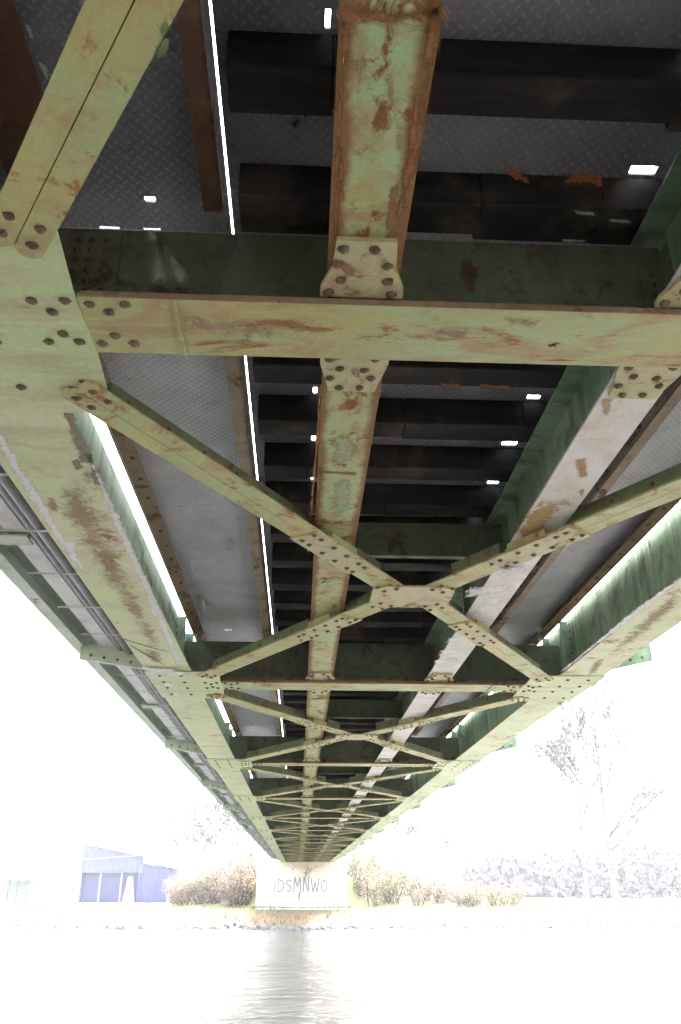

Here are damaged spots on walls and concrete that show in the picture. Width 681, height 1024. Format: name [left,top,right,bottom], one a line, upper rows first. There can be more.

corrosion [333,0,448,239]
corrosion [556,173,604,187]
corrosion [309,387,356,524]
corrosion [49,488,159,662]